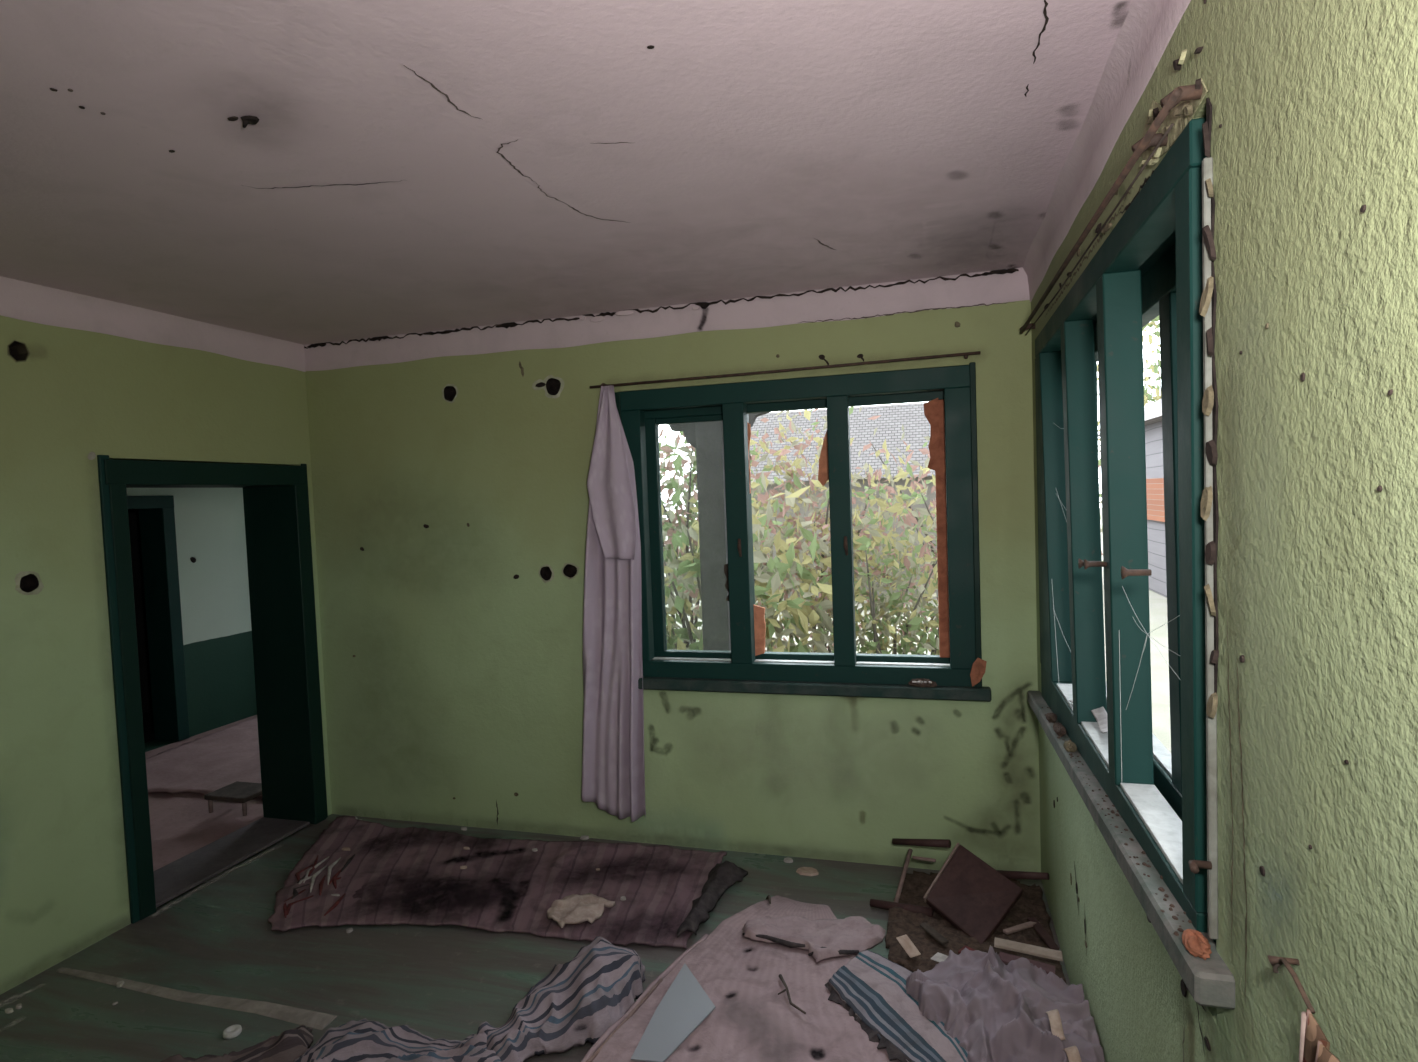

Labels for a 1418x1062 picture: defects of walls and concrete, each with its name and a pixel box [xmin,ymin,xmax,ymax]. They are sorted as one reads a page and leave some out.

crack [1024,0,1049,96]
spalling [1173,46,1203,70]
crack [404,65,631,223]
spalling [1119,78,1222,214]
crack [304,268,1019,349]
spalling [1199,178,1219,718]